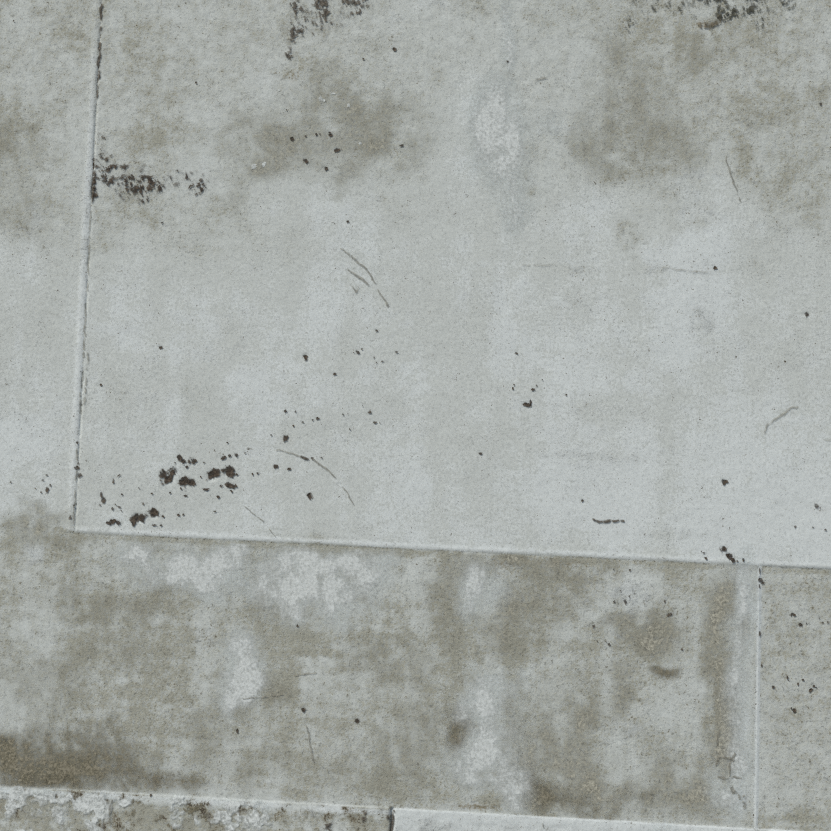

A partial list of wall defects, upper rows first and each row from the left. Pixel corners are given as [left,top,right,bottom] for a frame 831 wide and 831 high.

leakage [667,0,769,28]
spalling [159,452,246,498]
spalling [99,492,164,526]
leakage [121,543,249,598]
leakage [238,547,390,626]
leakage [437,557,538,650]
leakage [222,633,285,713]
leakage [642,571,750,809]
leakage [454,676,629,812]
peeling [0,786,131,831]
peeling [210,800,270,831]